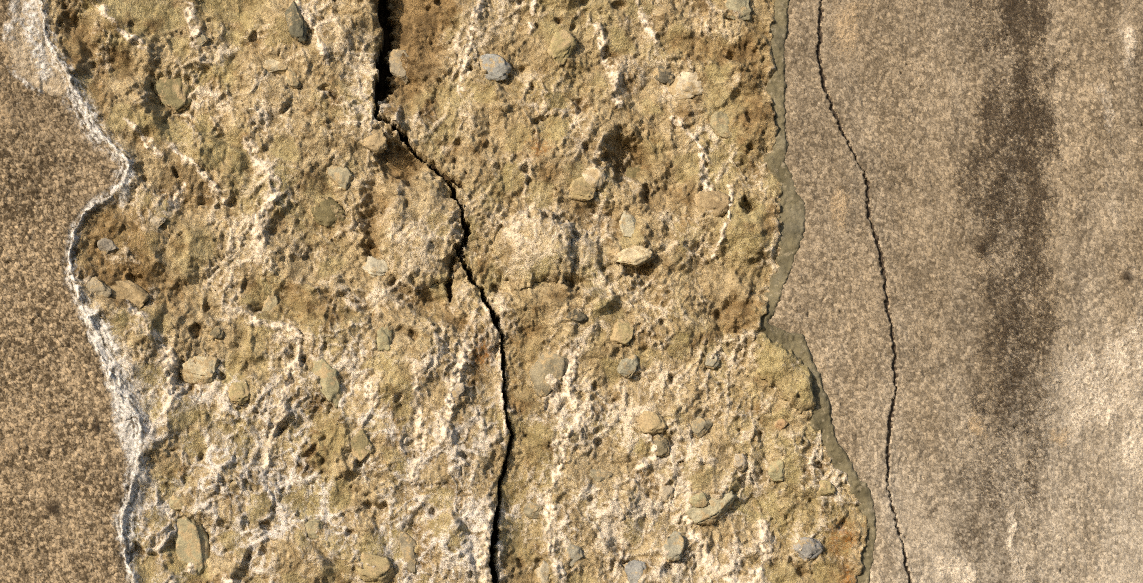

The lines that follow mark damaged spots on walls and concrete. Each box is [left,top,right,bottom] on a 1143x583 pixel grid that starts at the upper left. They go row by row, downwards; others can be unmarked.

water stain [37,0,150,583]
water stain [125,119,227,204]
water stain [242,138,282,265]
spalling [3,0,876,583]
water stain [408,342,474,482]
crack [374,0,514,583]
water stain [474,497,494,583]
water stain [483,304,508,449]
water stain [543,342,589,583]
water stain [682,502,770,583]
crack [816,0,912,583]
water stain [958,0,1143,482]